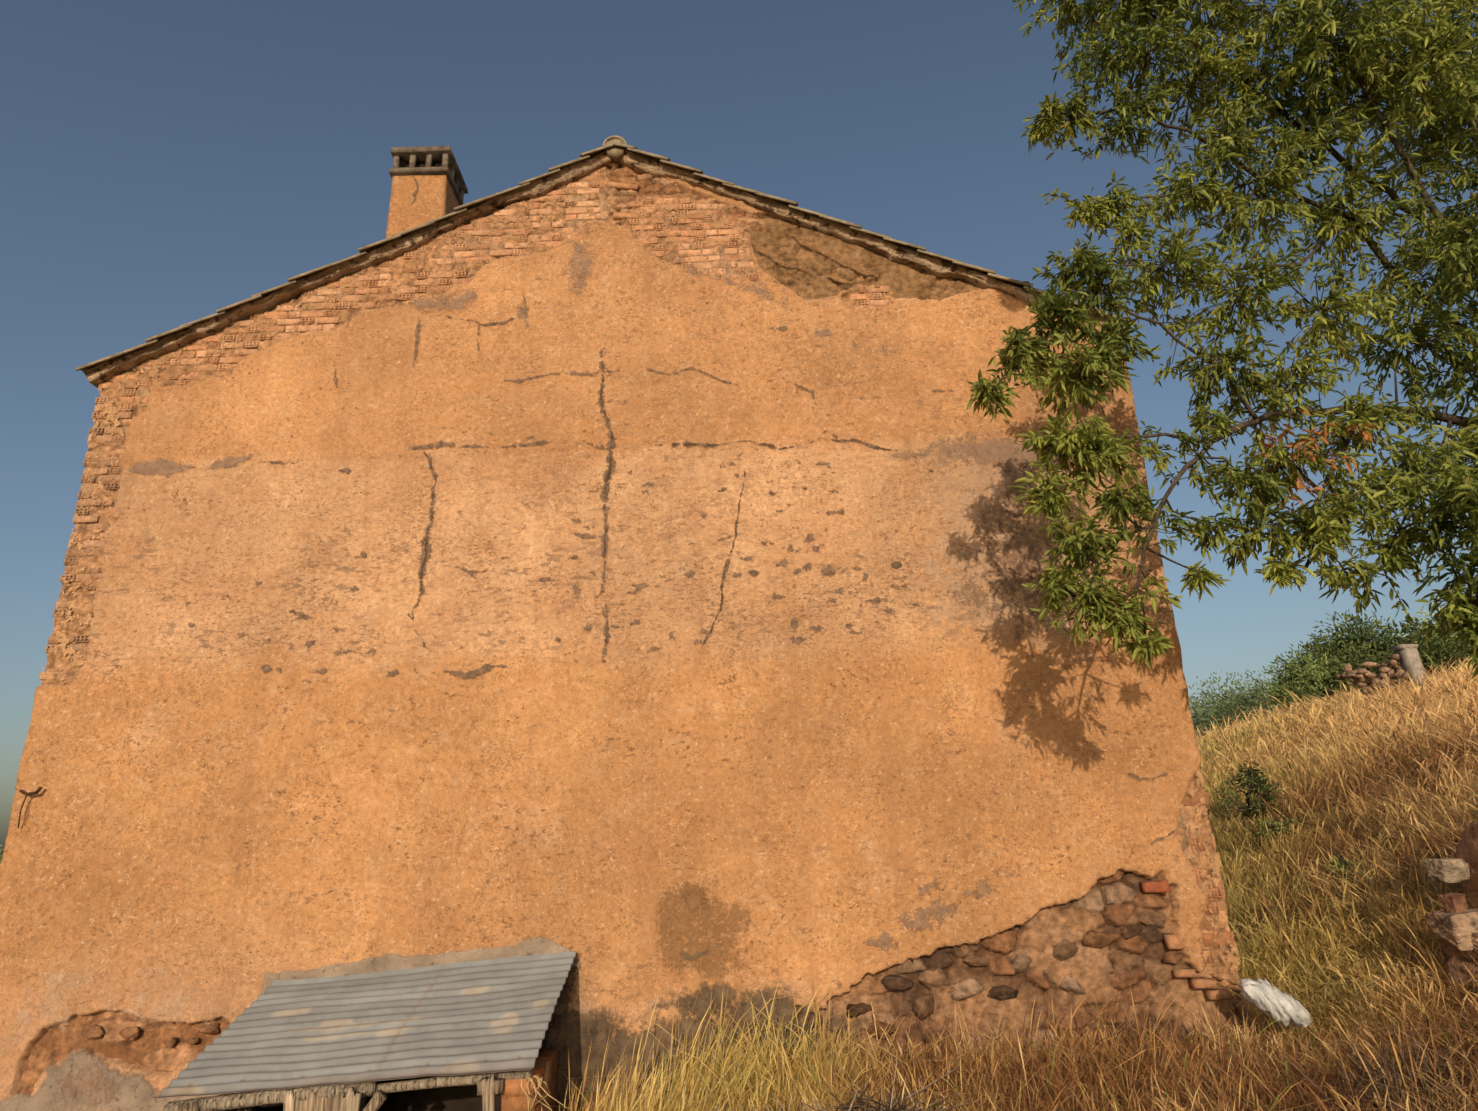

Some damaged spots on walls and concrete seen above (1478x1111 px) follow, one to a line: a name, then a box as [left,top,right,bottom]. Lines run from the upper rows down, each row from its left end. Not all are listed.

crack [414,292,528,360]
flaking render [39,162,981,687]
crack [407,349,737,679]
crack [655,383,898,648]
flaking render [20,1010,230,1096]
leakage [545,881,820,1111]
flaking render [795,769,1247,1070]